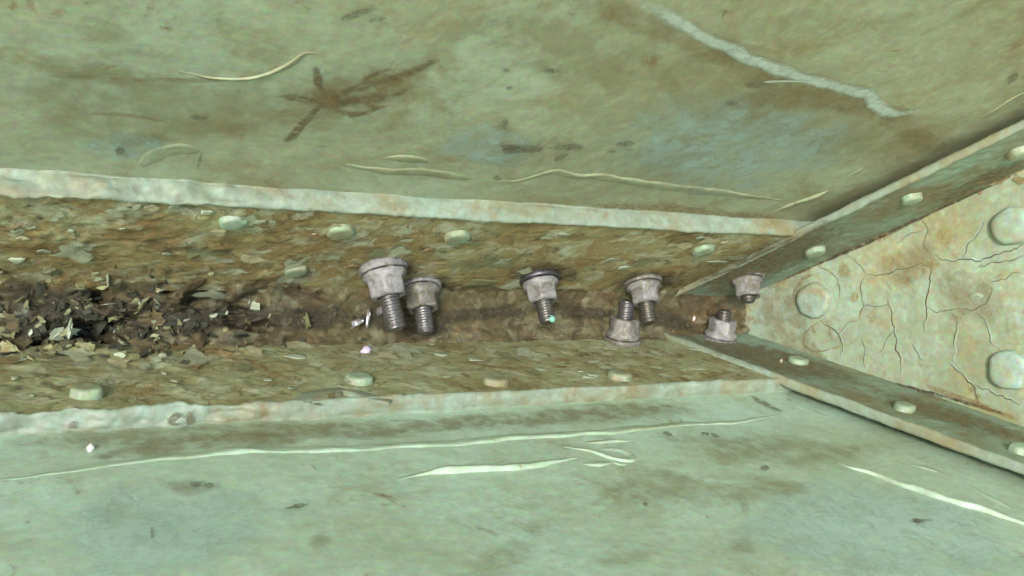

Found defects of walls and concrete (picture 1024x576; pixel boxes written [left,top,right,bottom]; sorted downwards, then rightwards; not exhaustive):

rust [285,60,435,141]
peeling [7,257,25,269]
peeling [37,229,99,263]
peeling [173,275,228,299]
peeling [185,249,269,275]
peeling [258,256,315,293]
crack [803,219,1024,410]